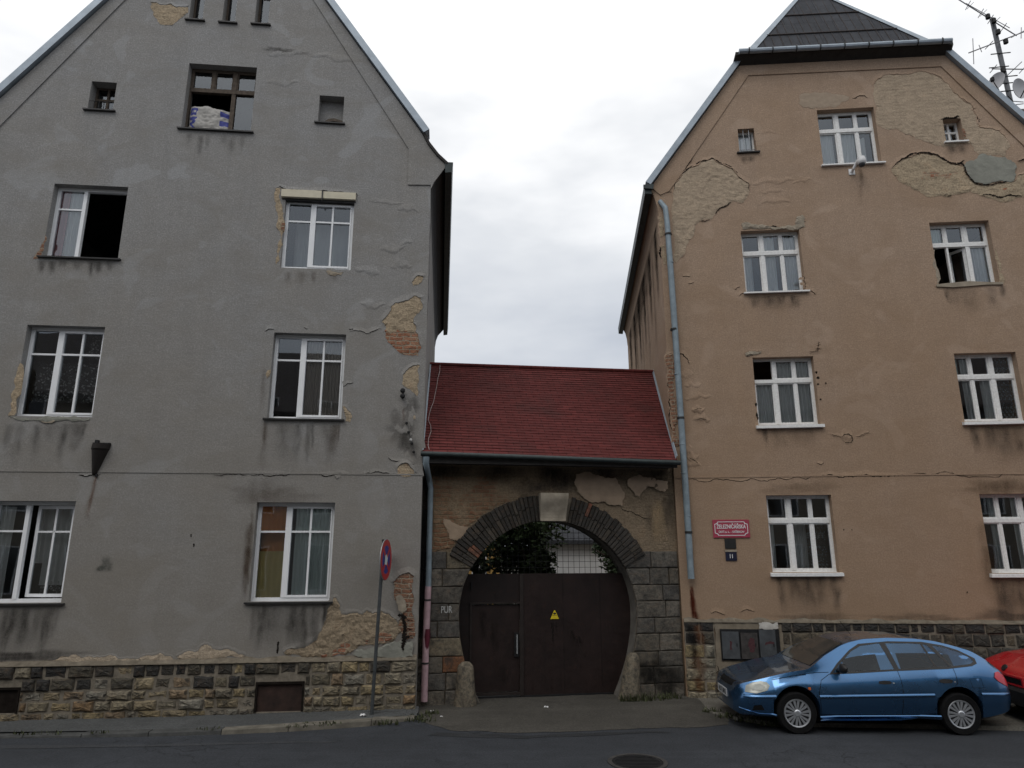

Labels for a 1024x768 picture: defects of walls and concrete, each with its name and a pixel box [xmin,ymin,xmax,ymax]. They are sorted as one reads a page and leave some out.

peeling [149,0,189,26]
peeling [871,68,1024,203]
peeling [658,156,751,265]
peeling [380,272,426,396]
crack [213,469,290,477]
crack [317,456,419,477]
peeling [574,472,669,506]
crack [689,458,1021,482]
peeling [282,566,419,658]